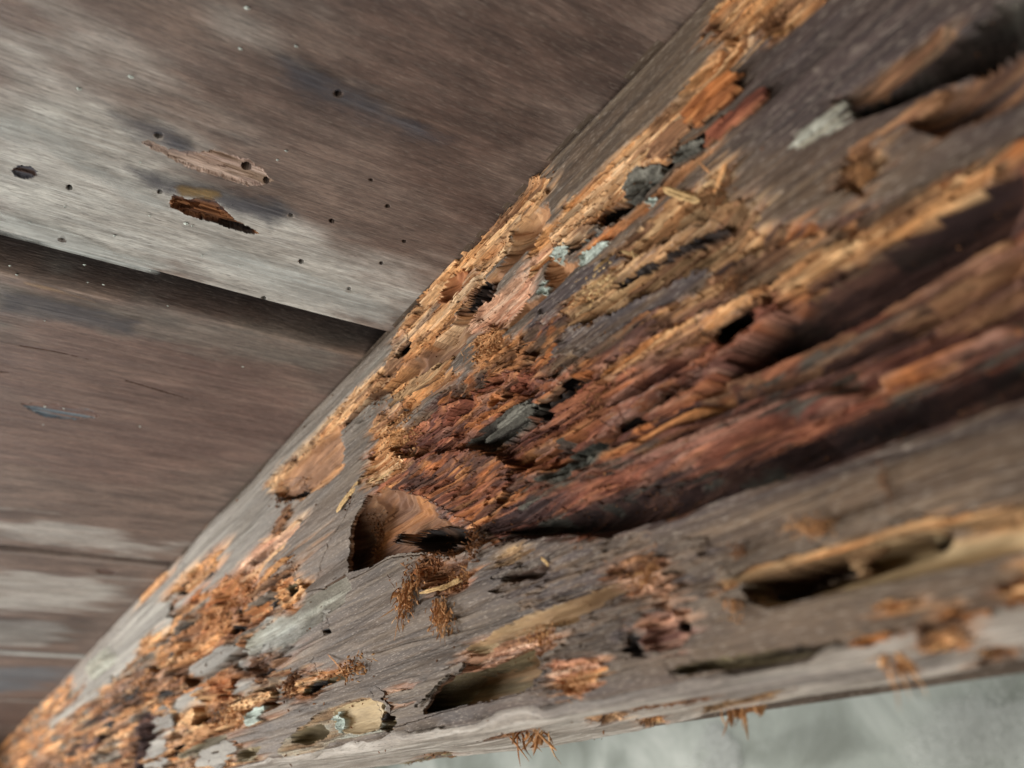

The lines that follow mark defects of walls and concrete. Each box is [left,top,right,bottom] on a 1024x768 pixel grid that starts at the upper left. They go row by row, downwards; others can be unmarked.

spalling [0,551,352,768]
spalling [265,0,1024,699]